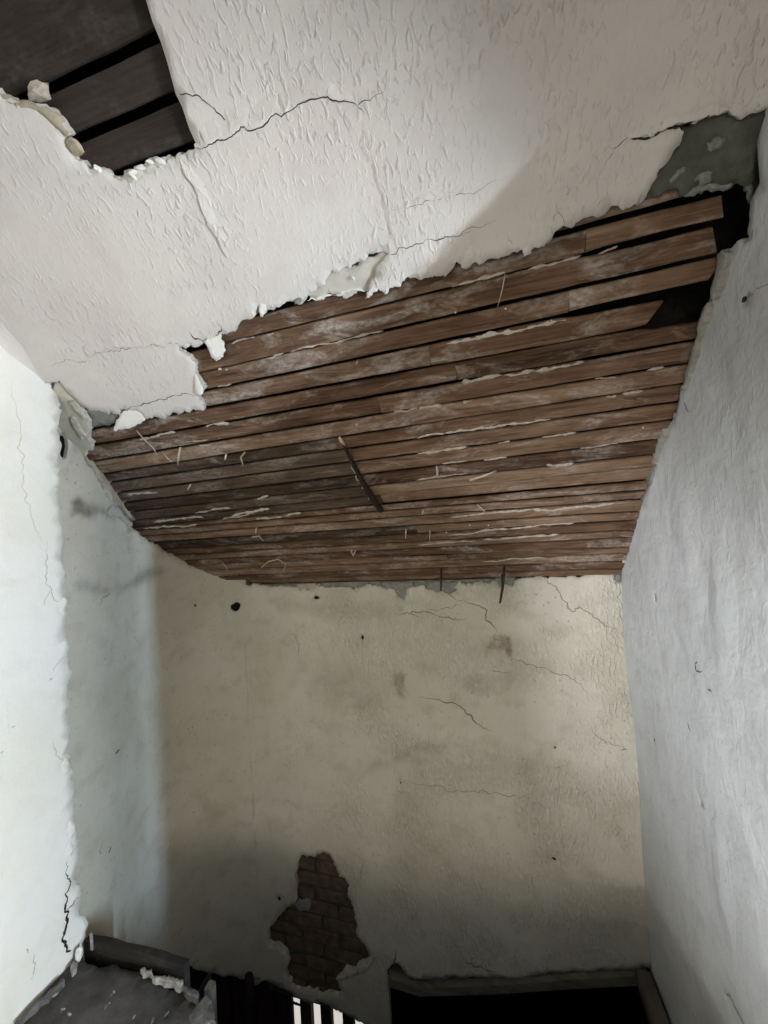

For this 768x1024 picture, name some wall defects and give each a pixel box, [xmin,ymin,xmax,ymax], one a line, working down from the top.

spalling [1,94,73,137]
spalling [114,155,180,183]
crack [180,74,512,257]
spalling [644,111,765,204]
peeling [293,252,388,305]
peeling [203,334,226,361]
peeling [84,408,146,431]
crack [543,577,624,638]
crack [394,594,587,693]
crack [421,697,489,731]
crack [61,863,78,953]
spalling [268,852,377,1009]